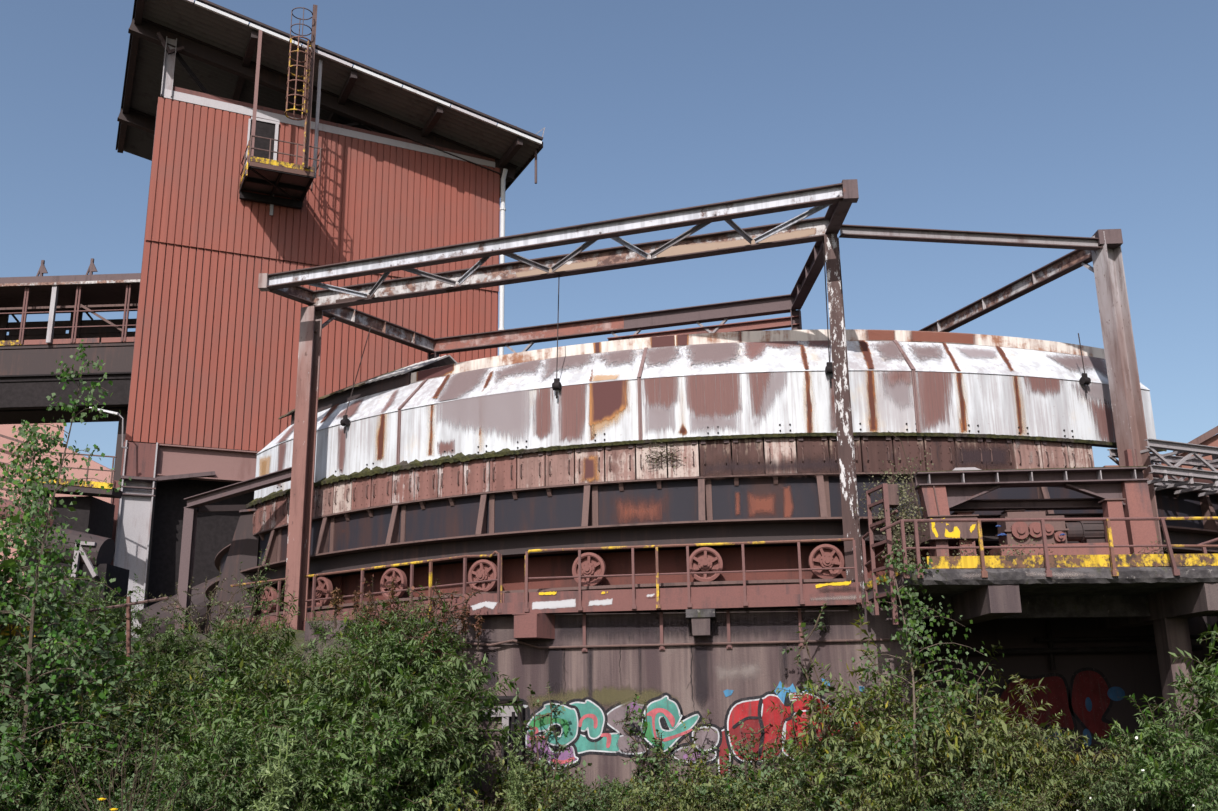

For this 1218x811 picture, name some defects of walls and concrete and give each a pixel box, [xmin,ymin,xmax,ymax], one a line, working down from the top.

corrosion [589,370,628,440]
corrosion [799,343,812,433]
corrosion [858,330,895,432]
corrosion [911,331,975,432]
corrosion [996,346,1024,436]
corrosion [583,456,599,482]
corrosion [617,499,662,524]
corrosion [735,486,793,518]
water stain [529,616,829,708]